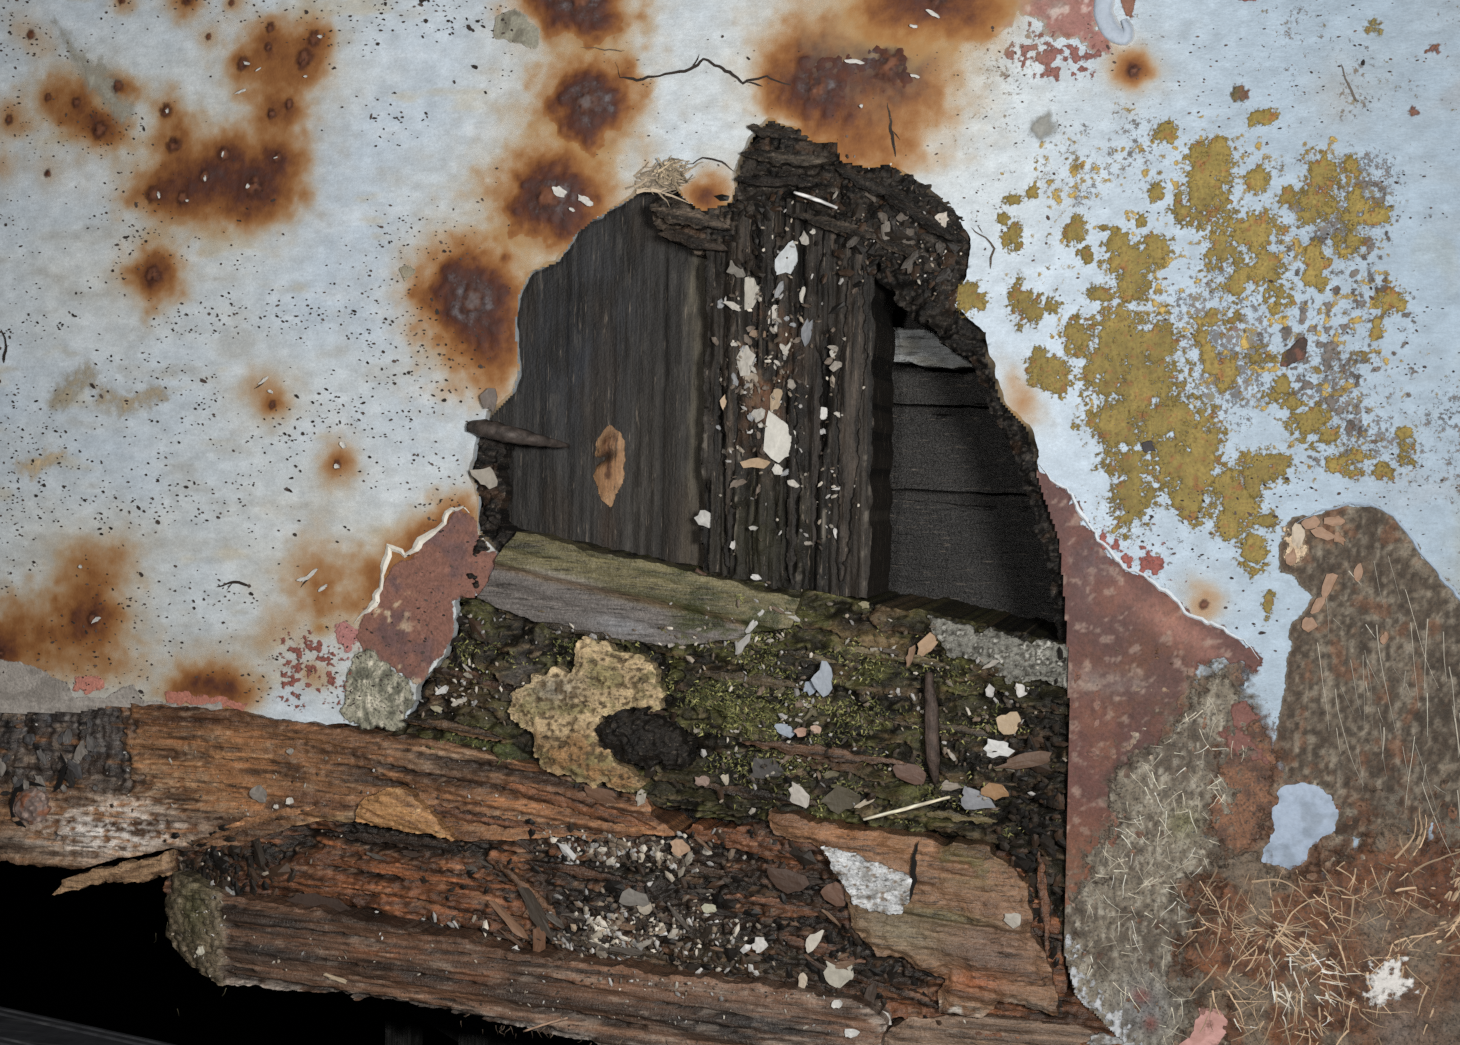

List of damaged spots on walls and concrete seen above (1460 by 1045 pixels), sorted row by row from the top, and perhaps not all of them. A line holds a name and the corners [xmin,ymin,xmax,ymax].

crack [582,47,791,86]
rust [753,0,1018,173]
peeling [917,0,1125,146]
rust [1110,48,1157,90]
rust [0,14,336,316]
rust [404,0,654,404]
peeling [935,212,949,227]
peeling [0,198,504,714]
peeling [694,510,711,528]
peeling [740,388,796,475]
peeling [956,28,1460,935]
rust [0,539,144,683]